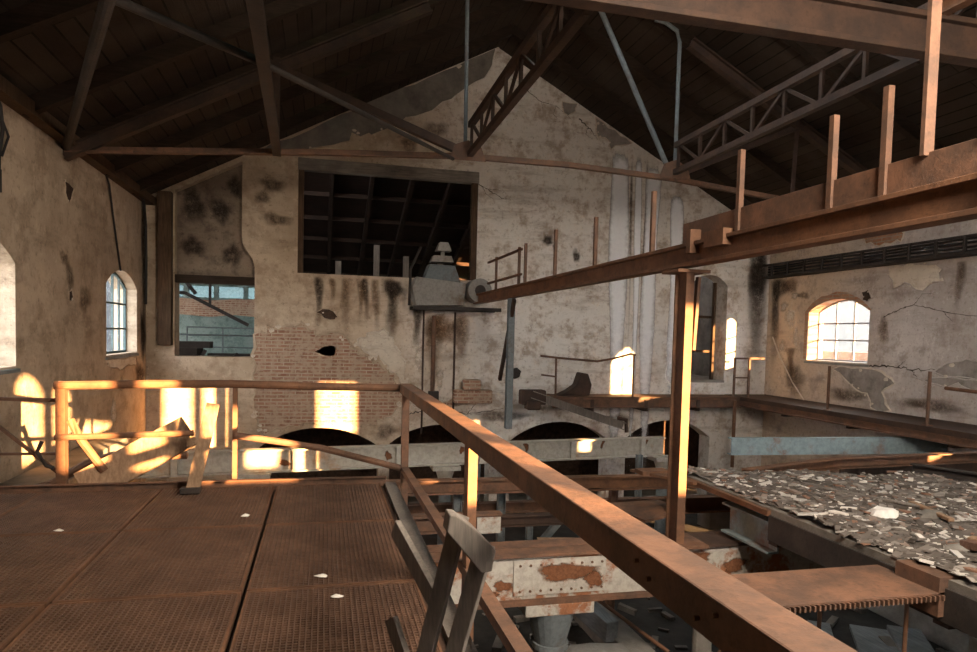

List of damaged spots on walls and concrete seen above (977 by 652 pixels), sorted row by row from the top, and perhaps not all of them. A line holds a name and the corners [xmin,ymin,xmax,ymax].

damp [184,187,229,224]
damp [750,259,767,291]
damp [315,278,403,322]
damp [414,310,422,332]
damp [777,281,807,389]
crack [884,292,973,321]
peeling [250,308,421,436]
crack [869,361,935,381]
damp [835,390,864,400]
damp [906,400,951,411]
corrosion [493,580,513,597]
corrosion [539,563,602,586]